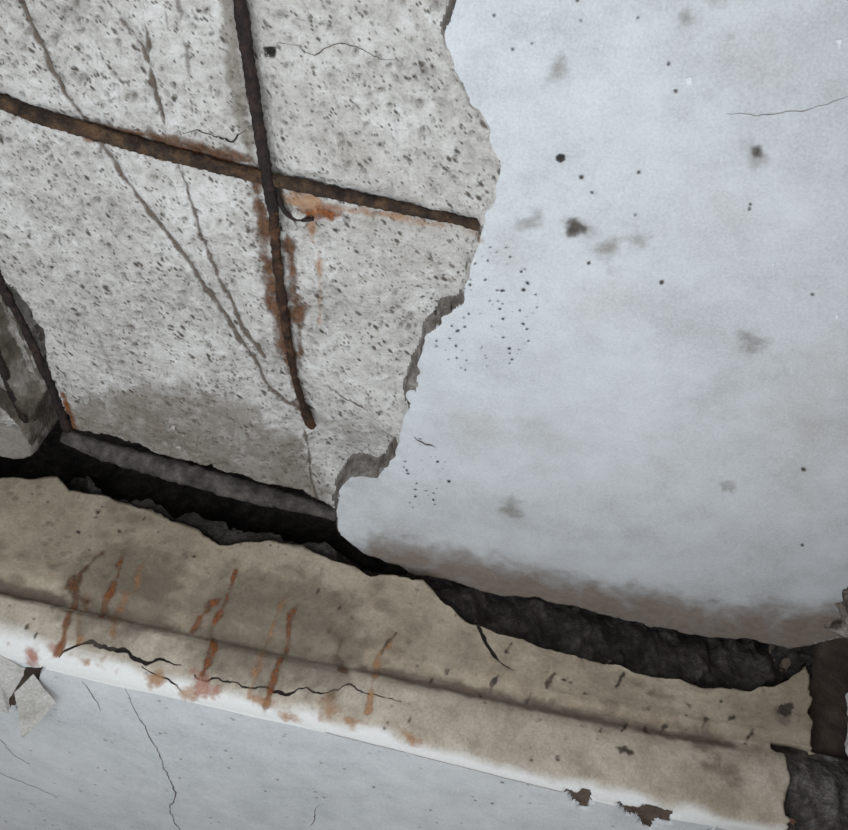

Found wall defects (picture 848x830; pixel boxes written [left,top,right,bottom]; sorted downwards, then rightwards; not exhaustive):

rust [92,123,258,169]
crack [183,129,246,143]
rust [280,191,340,230]
spalling [0,0,501,575]
rust [252,183,306,386]
rust [54,552,103,656]
crack [59,639,402,702]
crack [474,617,514,671]
crack [125,689,178,827]
flaking render [565,788,592,806]
flaking render [617,801,673,827]
spalling [770,745,848,830]